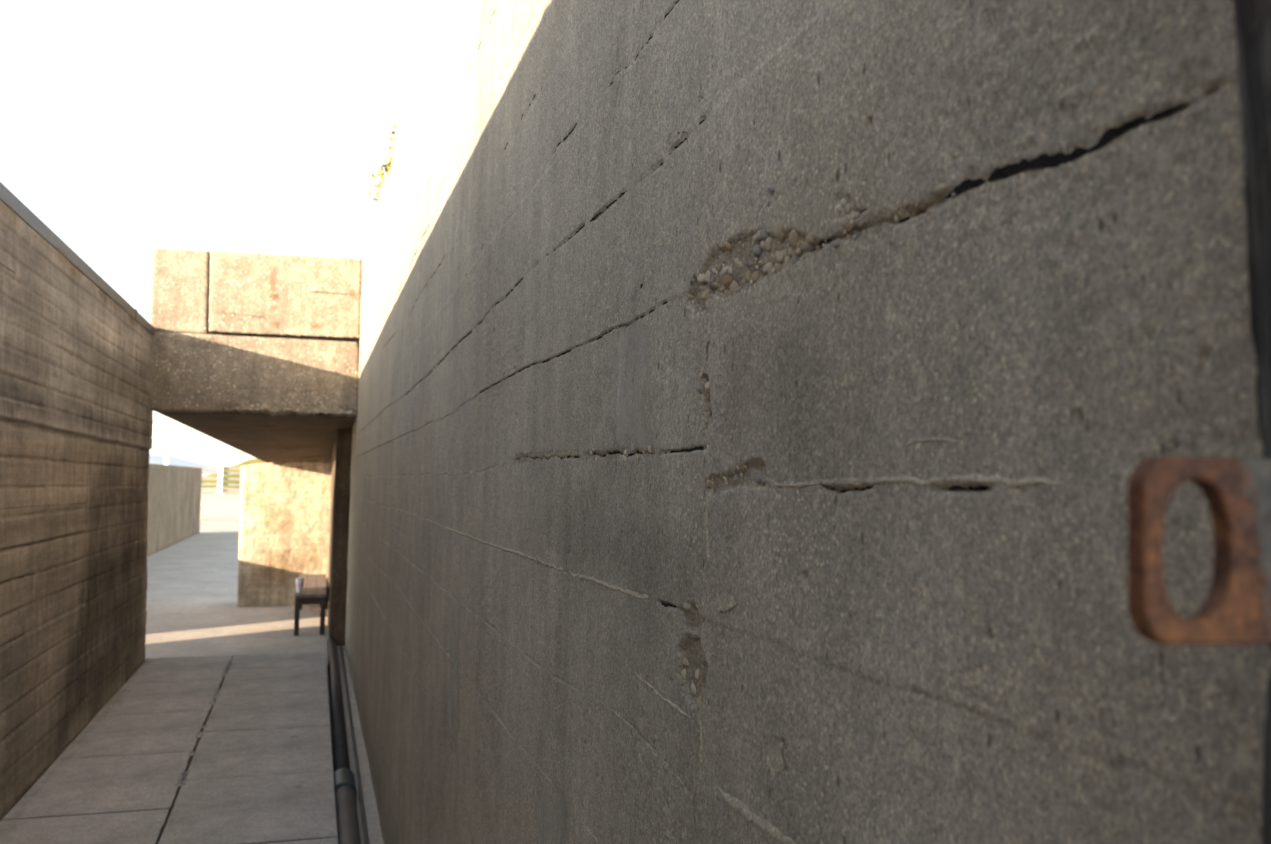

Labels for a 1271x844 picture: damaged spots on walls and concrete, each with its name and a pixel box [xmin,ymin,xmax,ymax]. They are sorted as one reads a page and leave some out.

crack [899,89,1214,223]
spalling [688,184,960,316]
crack [830,485,872,493]
crack [947,484,989,492]
spalling [677,592,736,709]